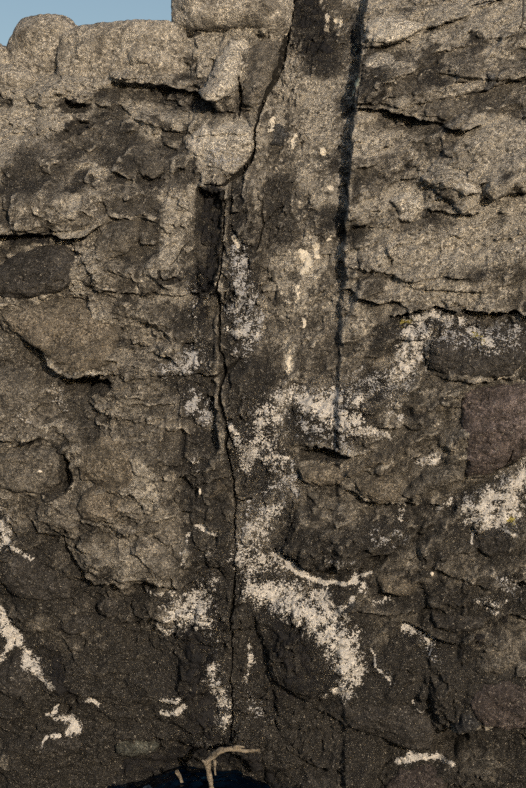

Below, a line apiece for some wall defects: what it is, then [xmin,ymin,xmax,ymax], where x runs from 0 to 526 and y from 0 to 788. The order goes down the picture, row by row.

crack [171,0,295,735]